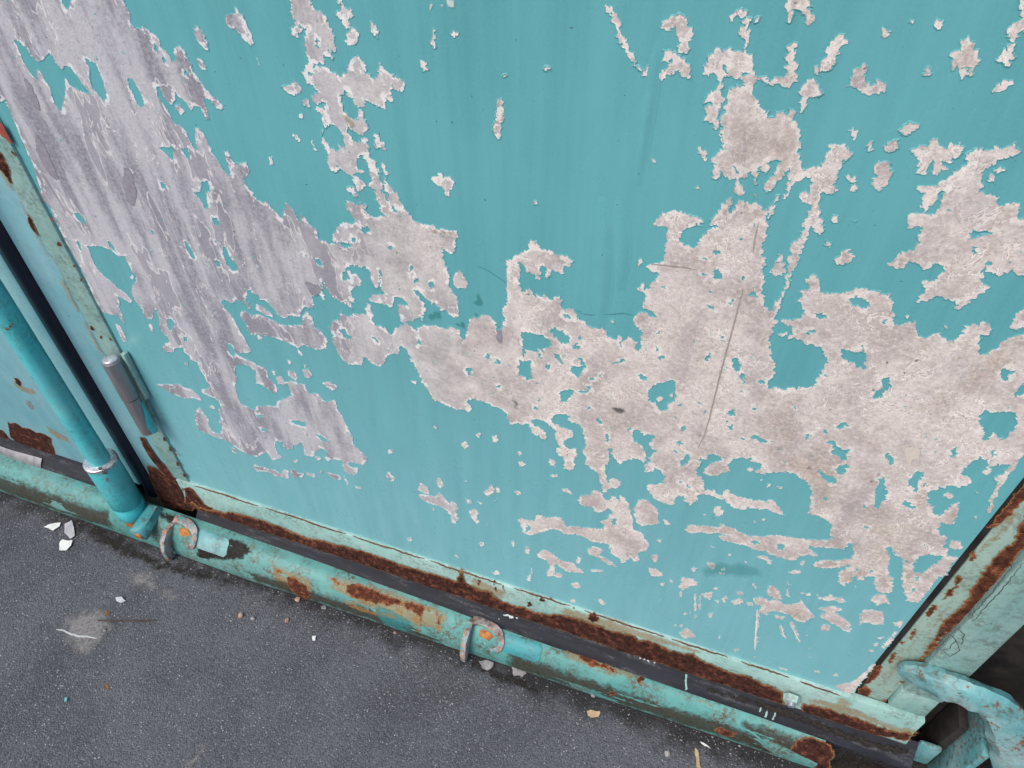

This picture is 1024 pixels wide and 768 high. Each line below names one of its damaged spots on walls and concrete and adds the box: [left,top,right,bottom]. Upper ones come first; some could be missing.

peeling [0,0,1024,606]
corrosion [0,422,56,455]
corrosion [140,437,840,706]
corrosion [915,484,1024,662]
peeling [674,624,696,639]
peeling [683,580,853,649]
peeling [858,609,886,625]
peeling [868,620,905,652]
corrosion [858,629,916,697]
corrosion [714,727,738,737]
corrosion [801,704,915,742]
corrosion [790,736,835,768]